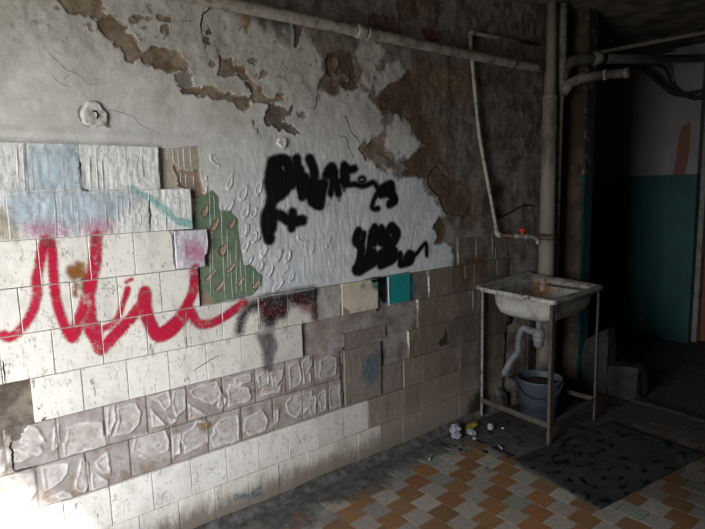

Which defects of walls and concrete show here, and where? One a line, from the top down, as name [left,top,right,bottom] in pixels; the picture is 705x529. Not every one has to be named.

peeling [59,0,306,135]
peeling [325,52,358,91]
peeling [358,134,393,175]
peeling [379,70,474,245]
crack [496,204,538,220]
spalling [0,379,46,446]